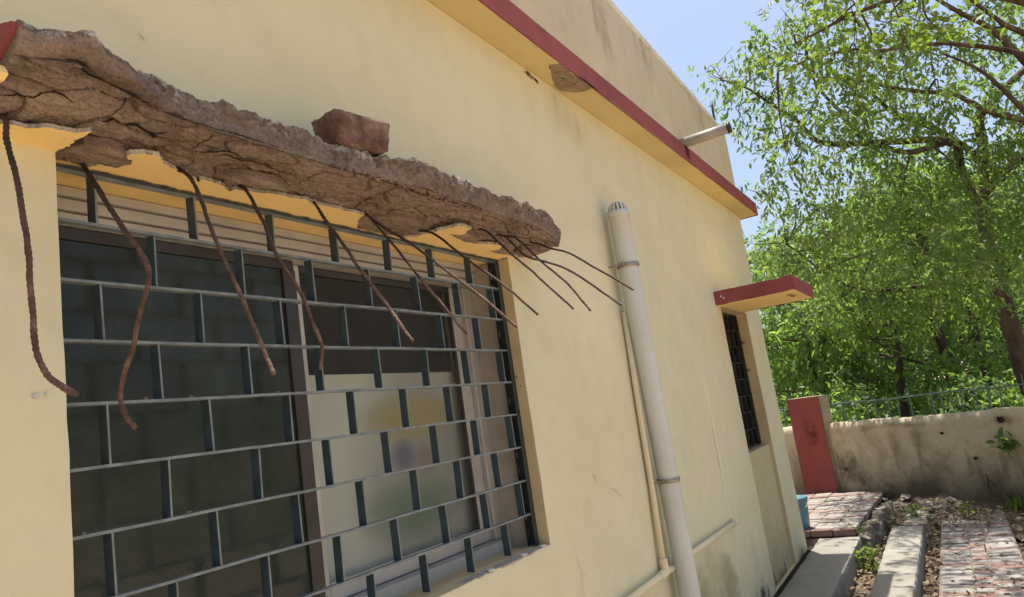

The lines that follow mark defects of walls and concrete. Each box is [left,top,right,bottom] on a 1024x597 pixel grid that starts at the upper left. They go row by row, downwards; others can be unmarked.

crack [0,90,74,103]
crack [78,62,290,175]
spalling [0,55,634,430]
crack [322,164,474,218]